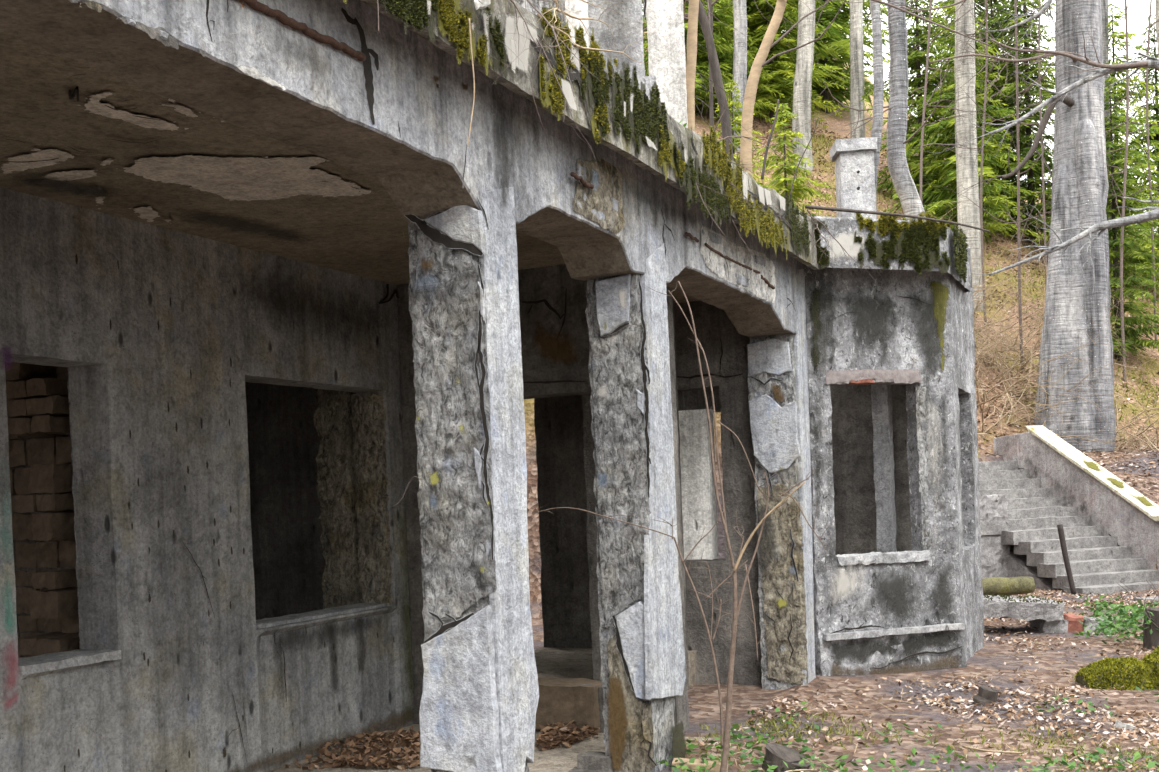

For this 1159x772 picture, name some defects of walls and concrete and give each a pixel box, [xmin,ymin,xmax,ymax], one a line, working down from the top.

corrosion [239,0,366,61]
peeling [78,92,226,131]
peeling [1,148,371,201]
crack [405,144,494,560]
spalling [409,229,497,639]